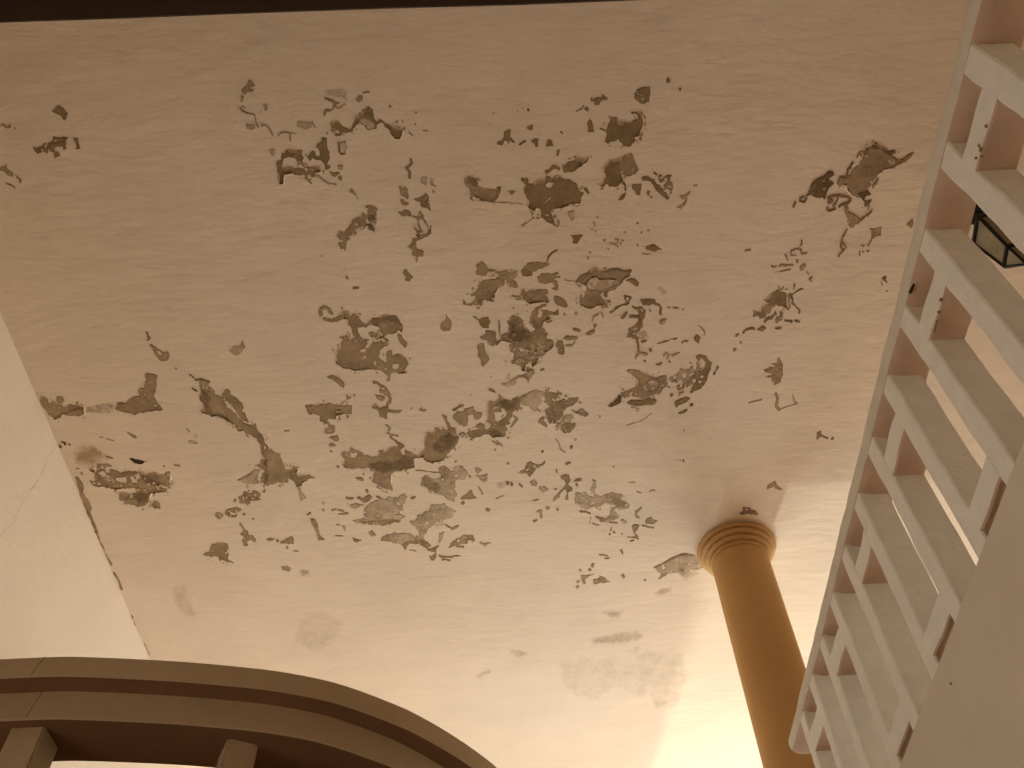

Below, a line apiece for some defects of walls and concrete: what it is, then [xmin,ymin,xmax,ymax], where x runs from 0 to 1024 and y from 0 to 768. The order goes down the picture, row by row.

peeling [33,136,80,158]
peeling [52,105,68,120]
peeling [239,80,428,251]
flaking render [464,87,698,227]
flaking render [793,140,914,258]
flaking render [733,286,800,352]
flaking render [37,373,163,422]
flaking render [305,249,719,589]
flaking render [75,458,180,534]
flaking render [189,374,314,552]
peeling [203,542,234,565]